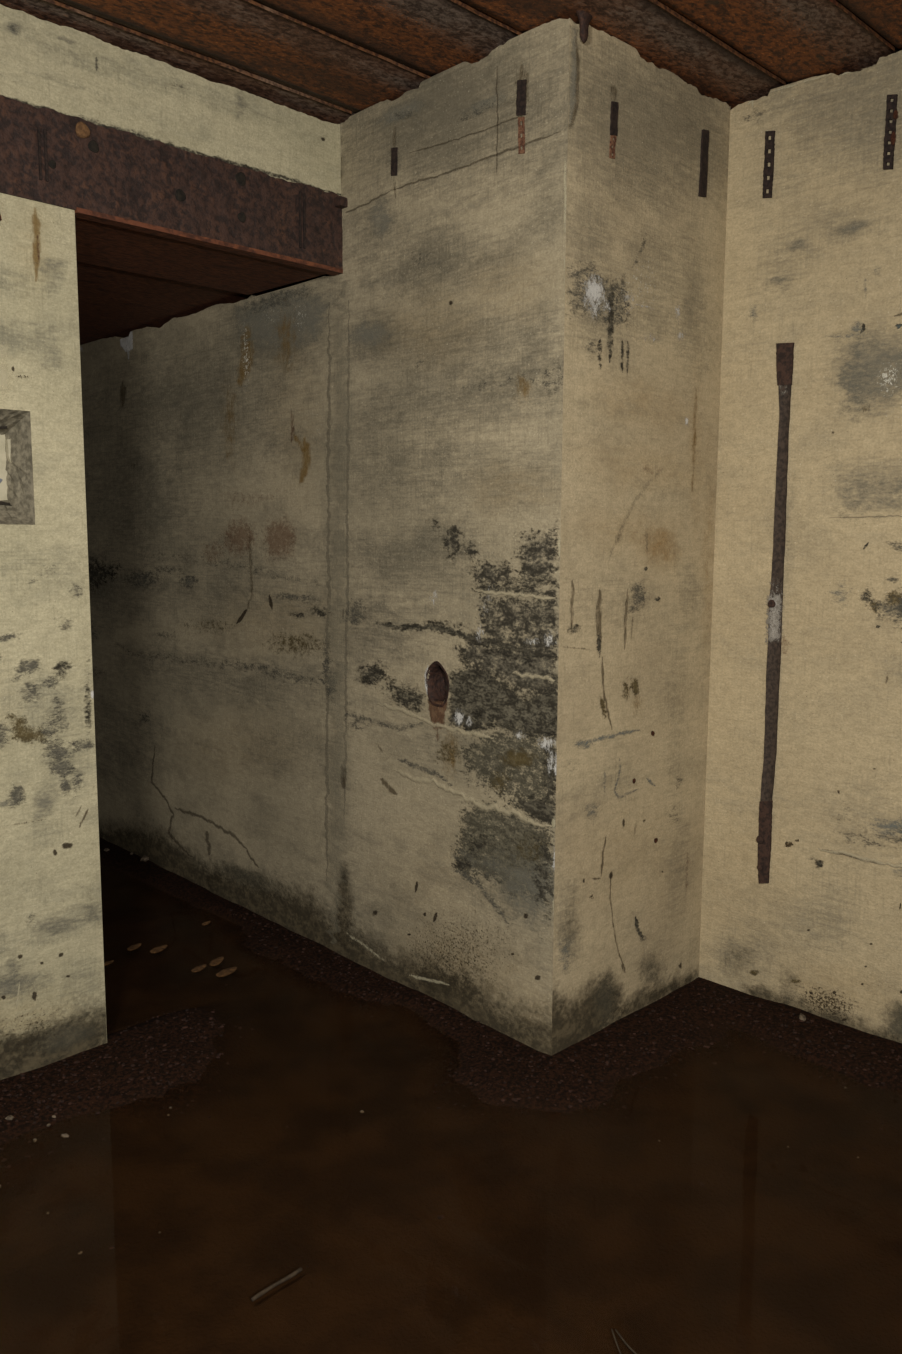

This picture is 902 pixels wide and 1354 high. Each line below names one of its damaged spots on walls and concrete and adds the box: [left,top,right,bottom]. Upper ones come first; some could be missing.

corrosion [576,10,593,43]
damp [568,263,651,373]
damp [75,555,198,596]
damp [861,578,902,628]
damp [0,660,93,792]
corrosion [428,701,447,740]
damp [2,786,50,807]
crack [151,748,259,868]
damp [99,520,694,1056]
damp [749,989,902,1043]